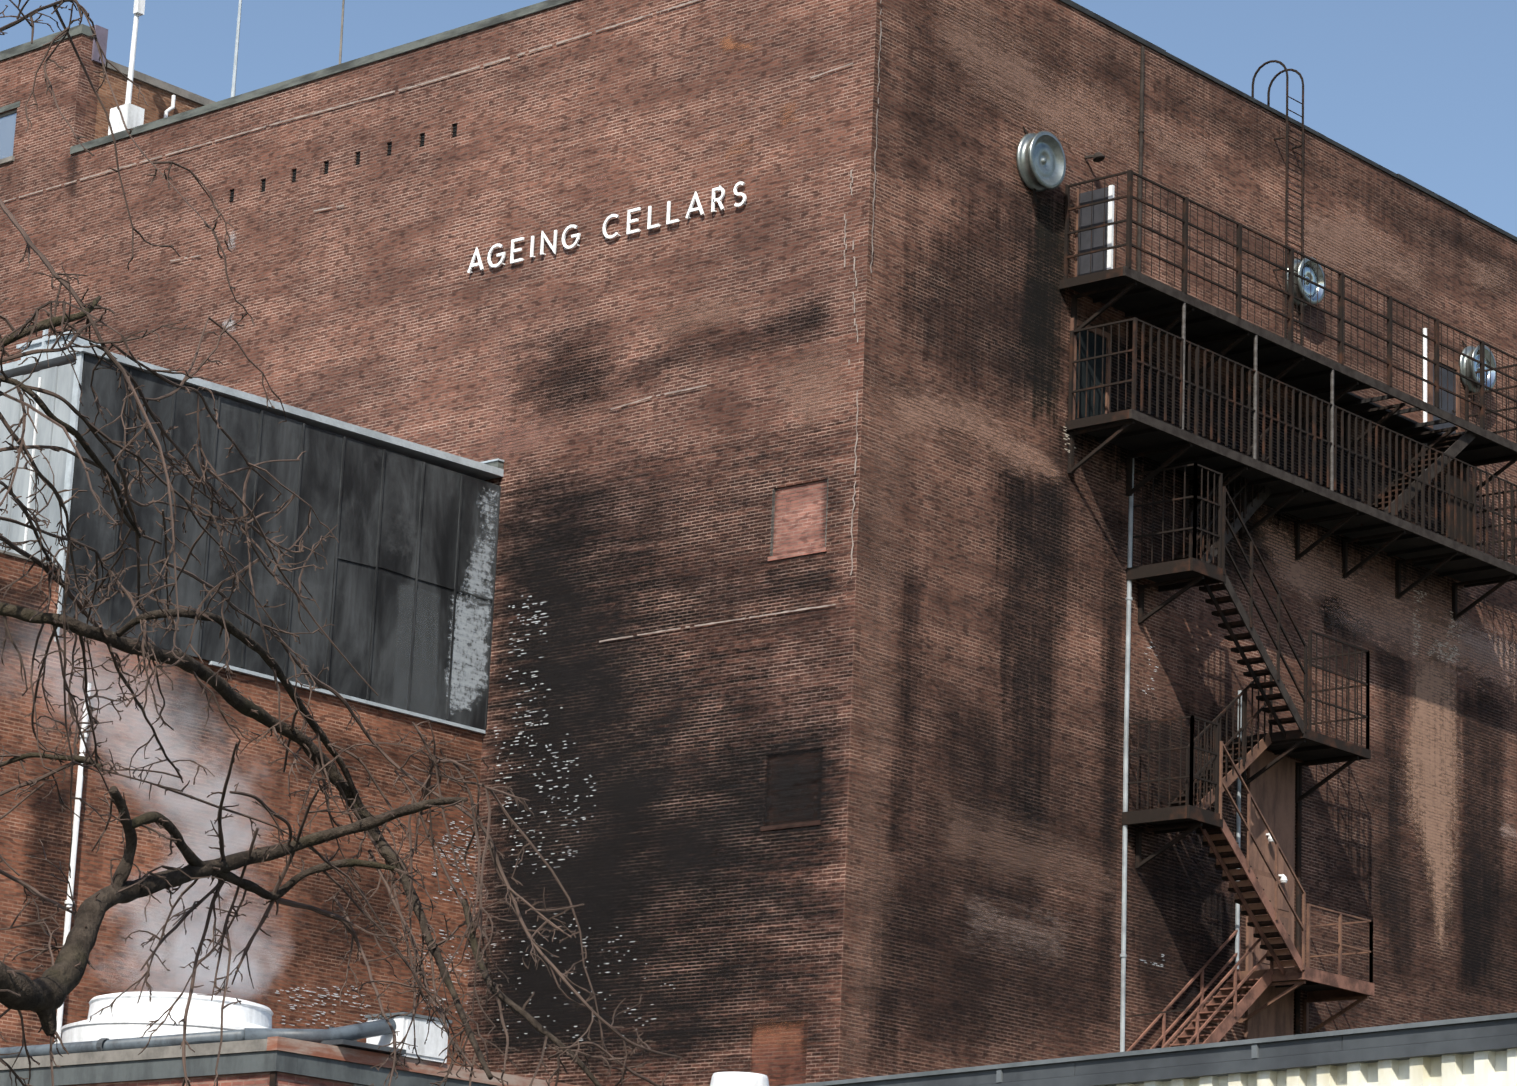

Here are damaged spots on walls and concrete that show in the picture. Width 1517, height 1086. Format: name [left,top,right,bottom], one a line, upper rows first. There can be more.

leakage [903,193,1075,453]
peeling [395,491,497,717]
leakage [494,596,596,868]
leakage [993,470,1068,856]
leakage [1380,590,1517,984]